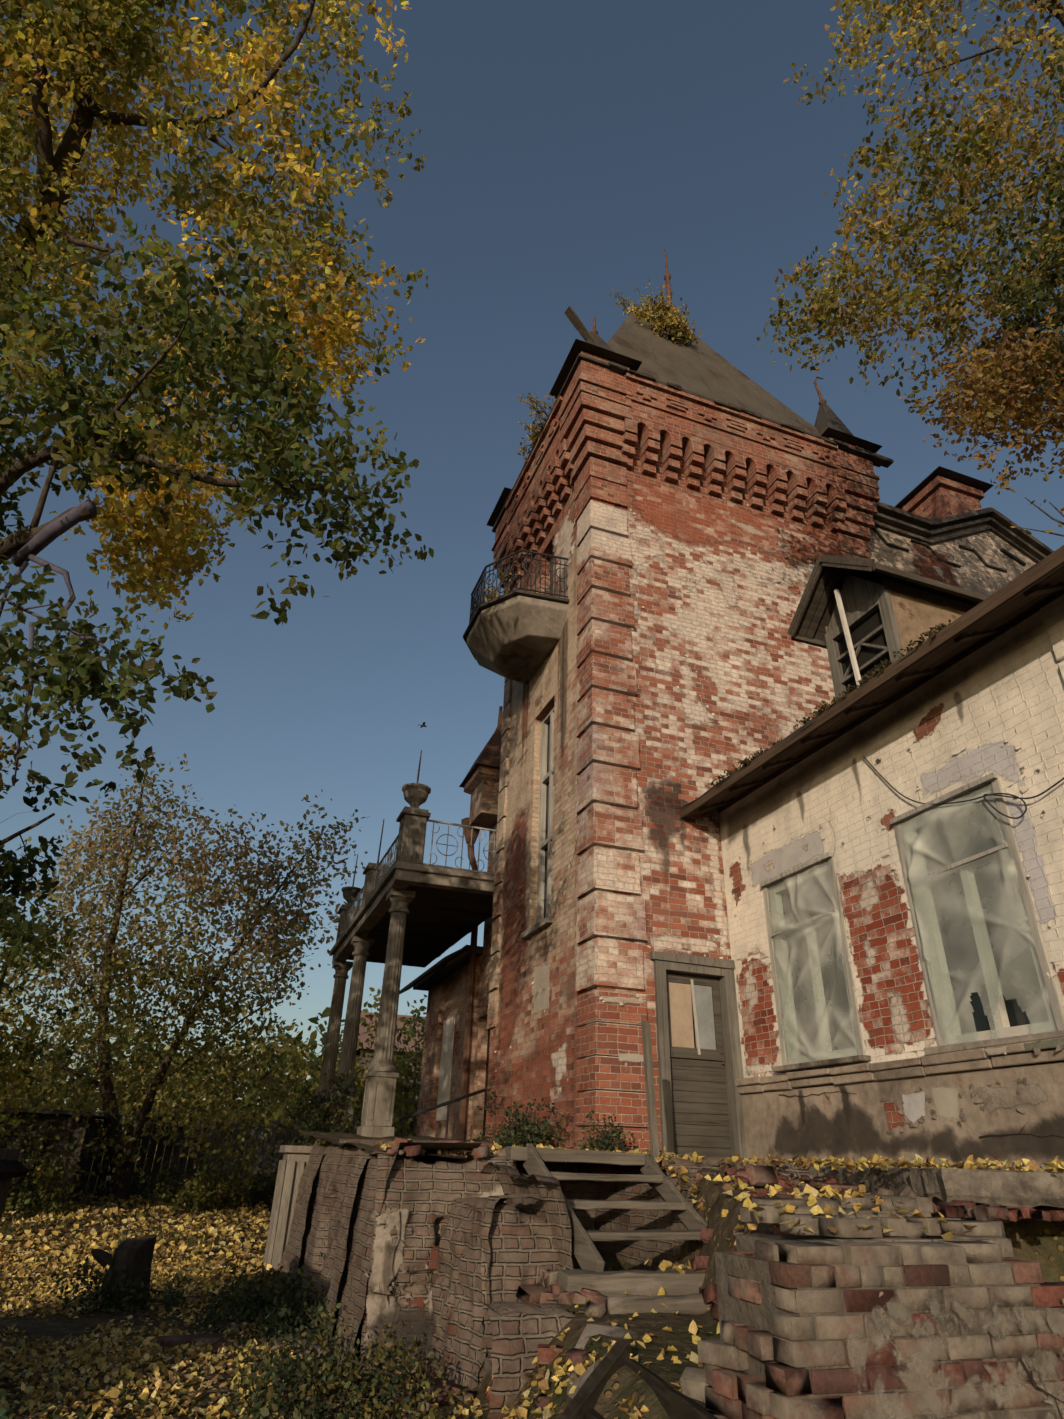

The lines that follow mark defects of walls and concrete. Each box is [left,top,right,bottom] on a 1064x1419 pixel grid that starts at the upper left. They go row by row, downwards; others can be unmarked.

spalling [629,479,840,630]
peeling [676,654,720,726]
spalling [906,703,945,752]
spalling [646,817,845,1077]
spalling [836,854,938,1055]
spalling [1047,962,1064,994]
water stain [772,1086,1064,1163]
water stain [847,1330,1027,1419]